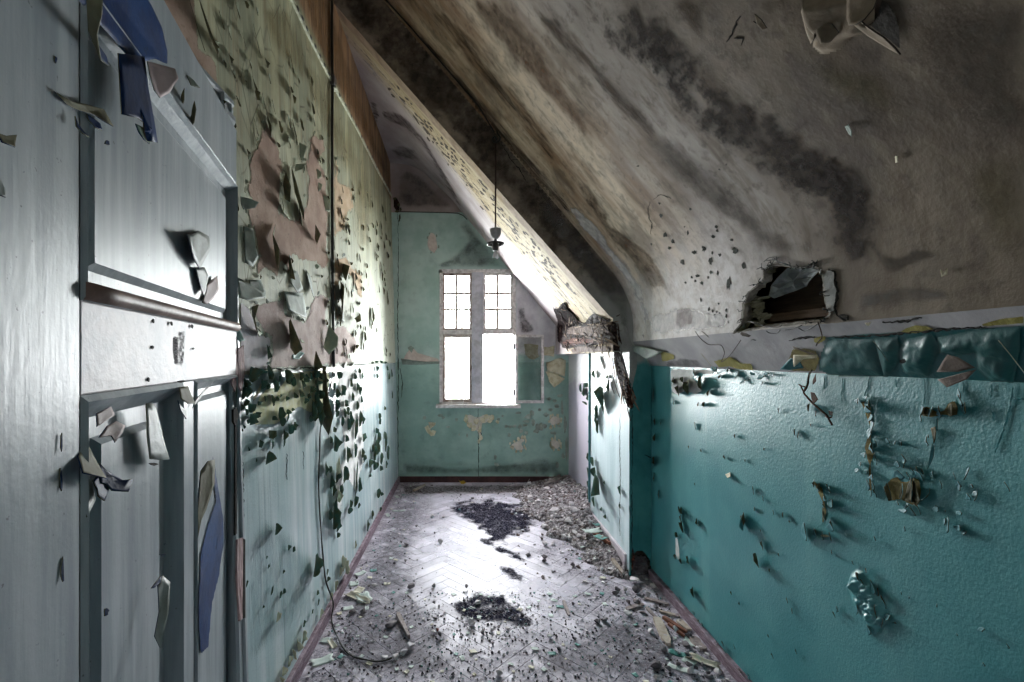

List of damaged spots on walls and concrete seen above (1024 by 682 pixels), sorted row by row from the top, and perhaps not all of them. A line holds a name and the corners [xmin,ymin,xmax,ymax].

peeling [54,0,200,145]
leakage [606,9,874,260]
peeling [164,0,440,538]
spalling [700,264,836,337]
peeling [77,447,133,517]
peeling [146,403,169,466]
peeling [150,575,170,648]
peeling [198,459,224,653]
peeling [280,553,373,682]
peeling [586,452,606,526]
spalling [423,303,826,468]
spalling [854,396,967,535]